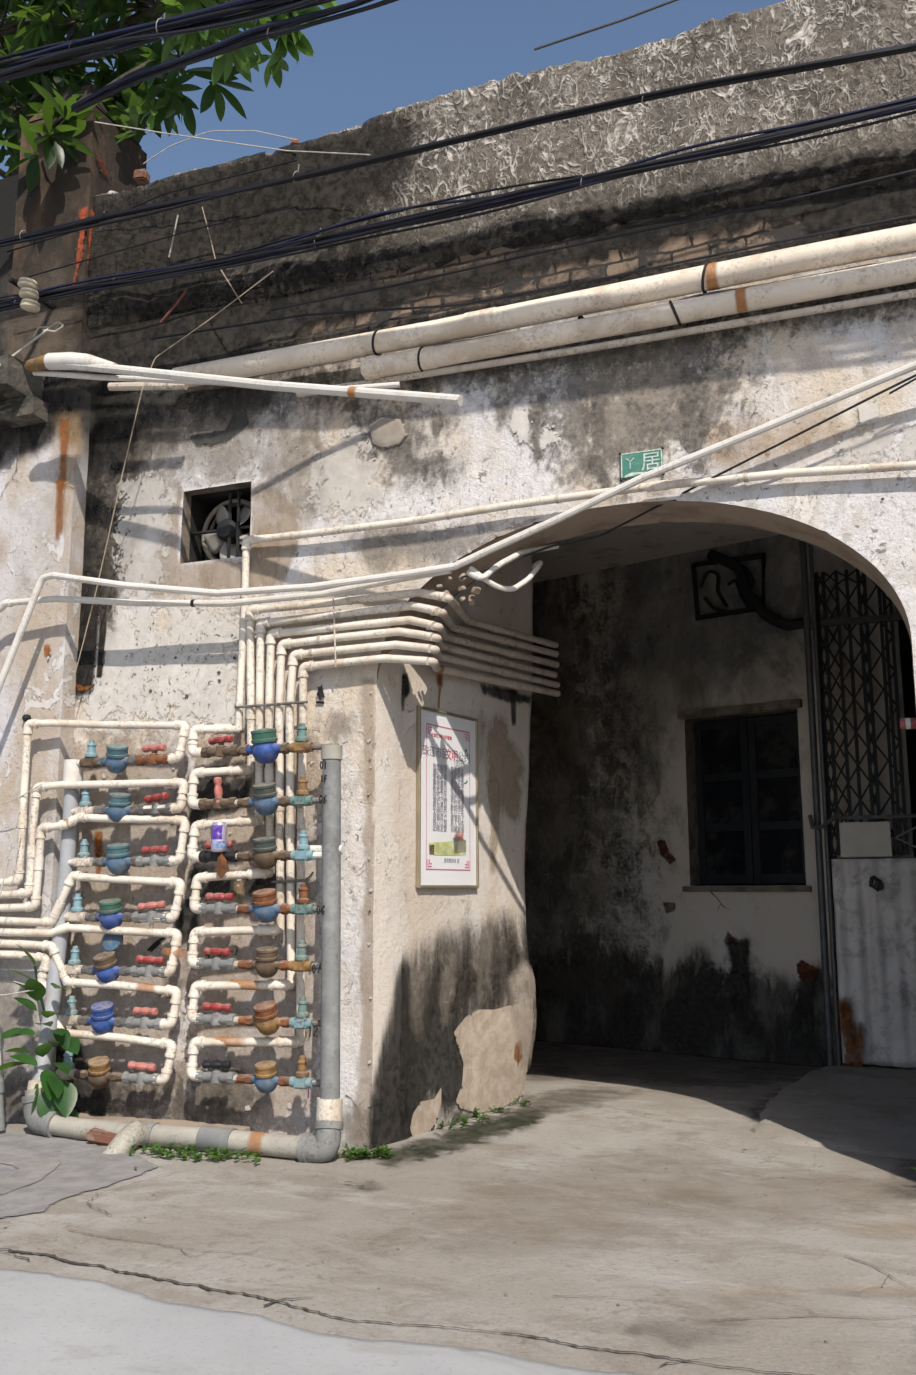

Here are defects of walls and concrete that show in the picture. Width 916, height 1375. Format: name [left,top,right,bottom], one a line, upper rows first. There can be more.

leakage [0,109,916,699]
rust [56,420,72,538]
leakage [342,535,837,1149]
leakage [0,981,37,1124]
leakage [55,1045,262,1124]
peeling [410,998,534,1137]
rust [839,1000,864,1068]